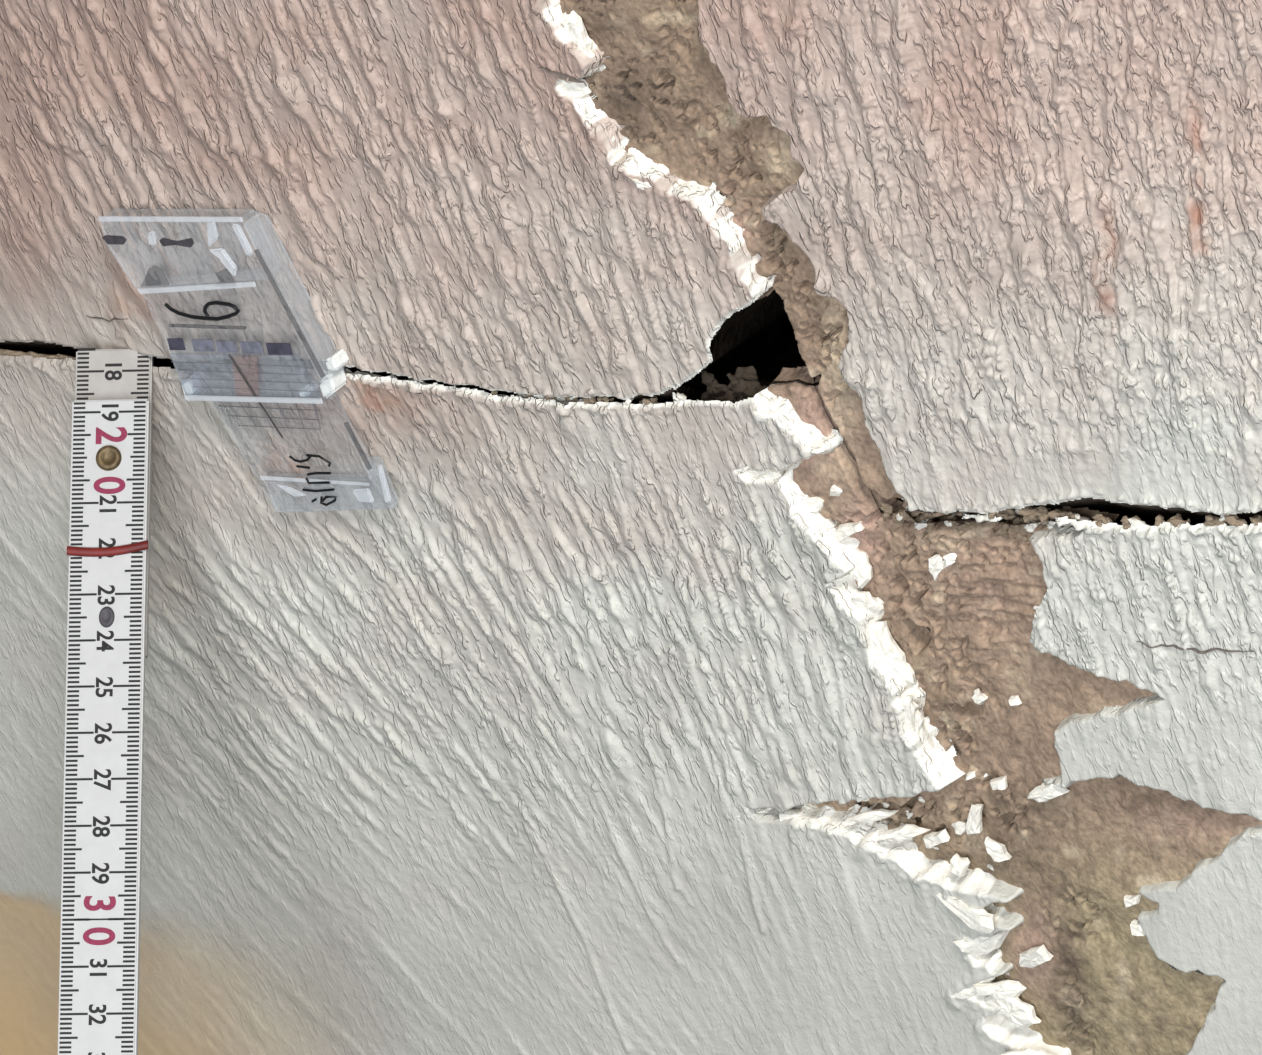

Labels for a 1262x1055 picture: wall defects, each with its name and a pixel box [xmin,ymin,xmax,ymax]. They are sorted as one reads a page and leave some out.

crack [86,314,124,322]
crack [0,340,78,360]
crack [154,357,702,406]
spalling [549,0,1262,1055]
crack [871,493,1262,531]